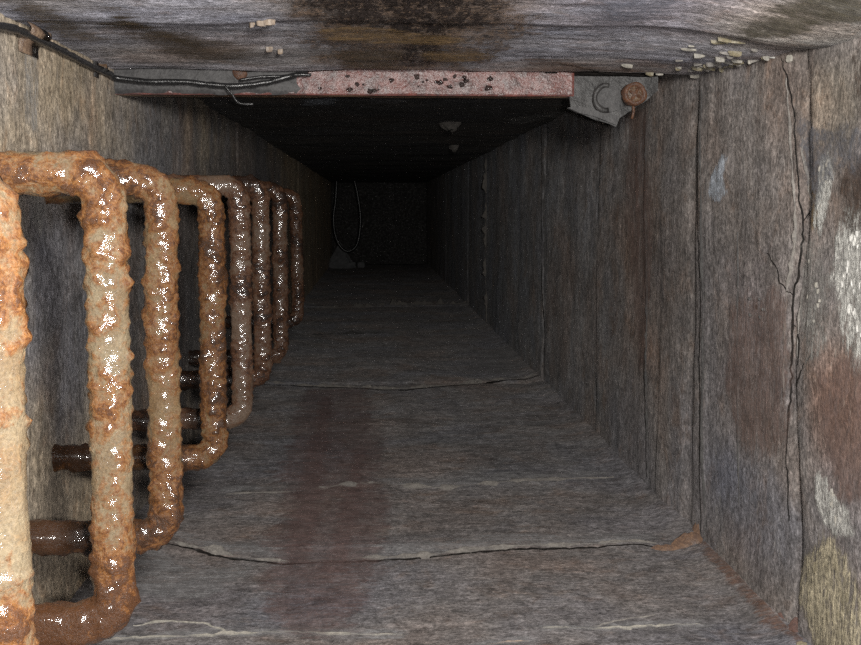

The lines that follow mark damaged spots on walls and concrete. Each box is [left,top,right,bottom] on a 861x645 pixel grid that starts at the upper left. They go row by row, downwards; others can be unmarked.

crack [767,58,814,521]
water stain [799,536,861,645]